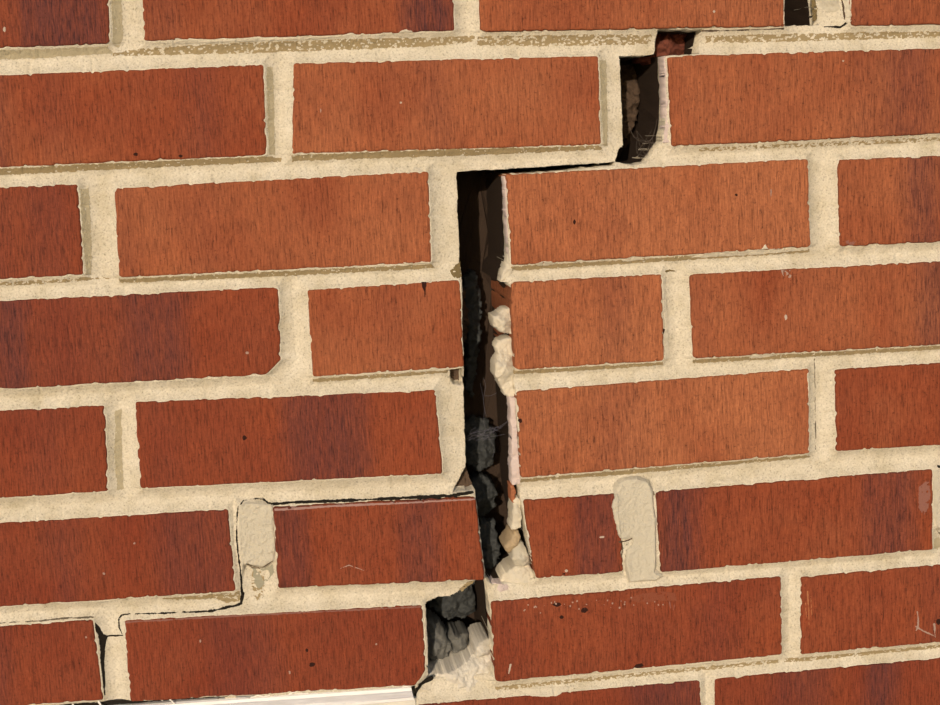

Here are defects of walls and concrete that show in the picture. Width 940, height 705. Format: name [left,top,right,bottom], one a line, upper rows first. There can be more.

crack [657,0,847,55]
crack [0,55,660,705]